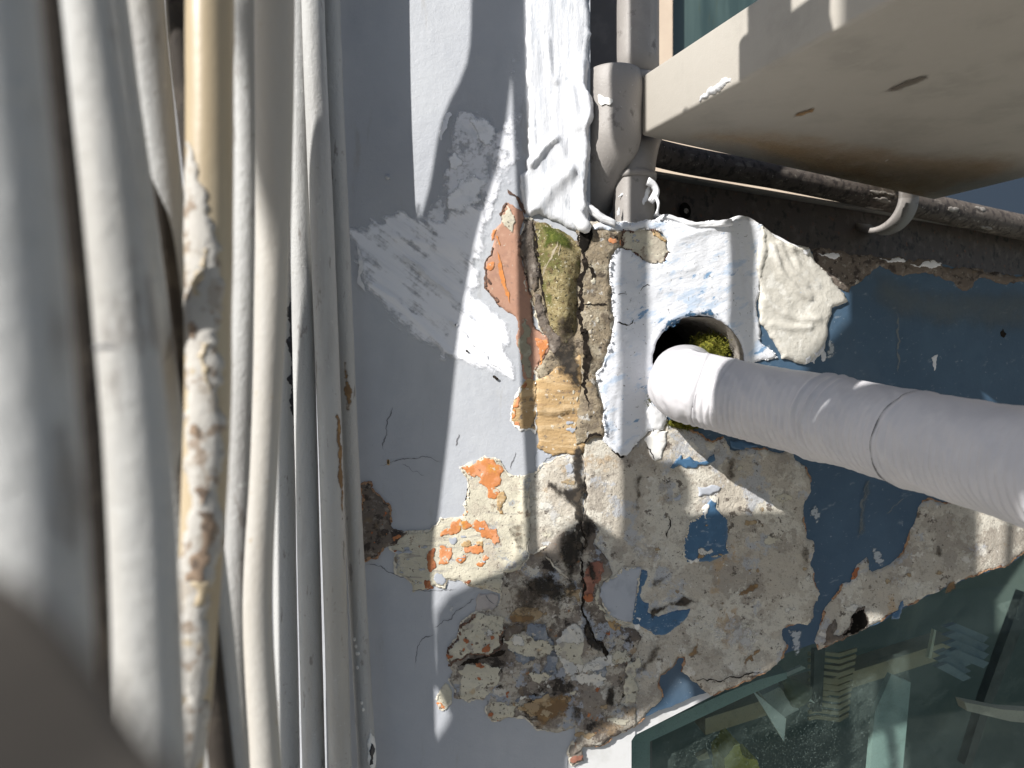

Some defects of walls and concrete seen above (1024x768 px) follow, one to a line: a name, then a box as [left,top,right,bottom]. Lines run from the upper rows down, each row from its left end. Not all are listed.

crack [533,225,547,313]
crack [576,249,648,407]
peeling [179,142,227,768]
crack [584,432,654,459]
flaking render [361,189,1024,768]
crack [546,524,609,659]